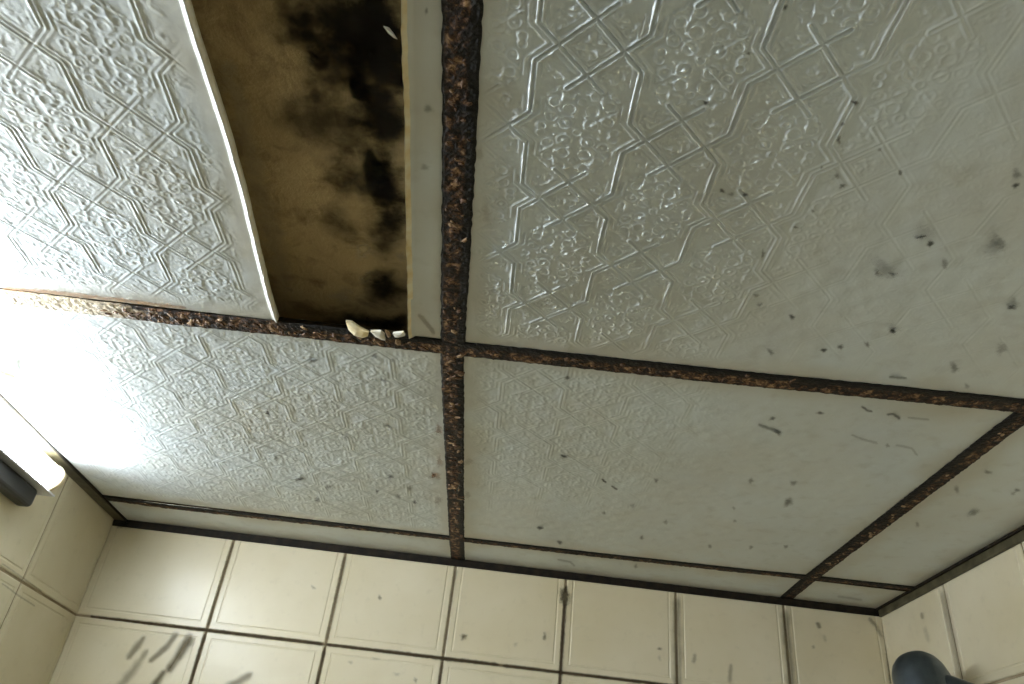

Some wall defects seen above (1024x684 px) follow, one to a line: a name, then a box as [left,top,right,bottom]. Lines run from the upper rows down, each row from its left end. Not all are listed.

water stain [287,0,405,252]
rust [445,199,467,242]
water stain [366,272,402,302]
rust [101,308,428,351]
water stain [343,314,406,331]
peeling [346,320,405,341]
rust [428,354,482,557]